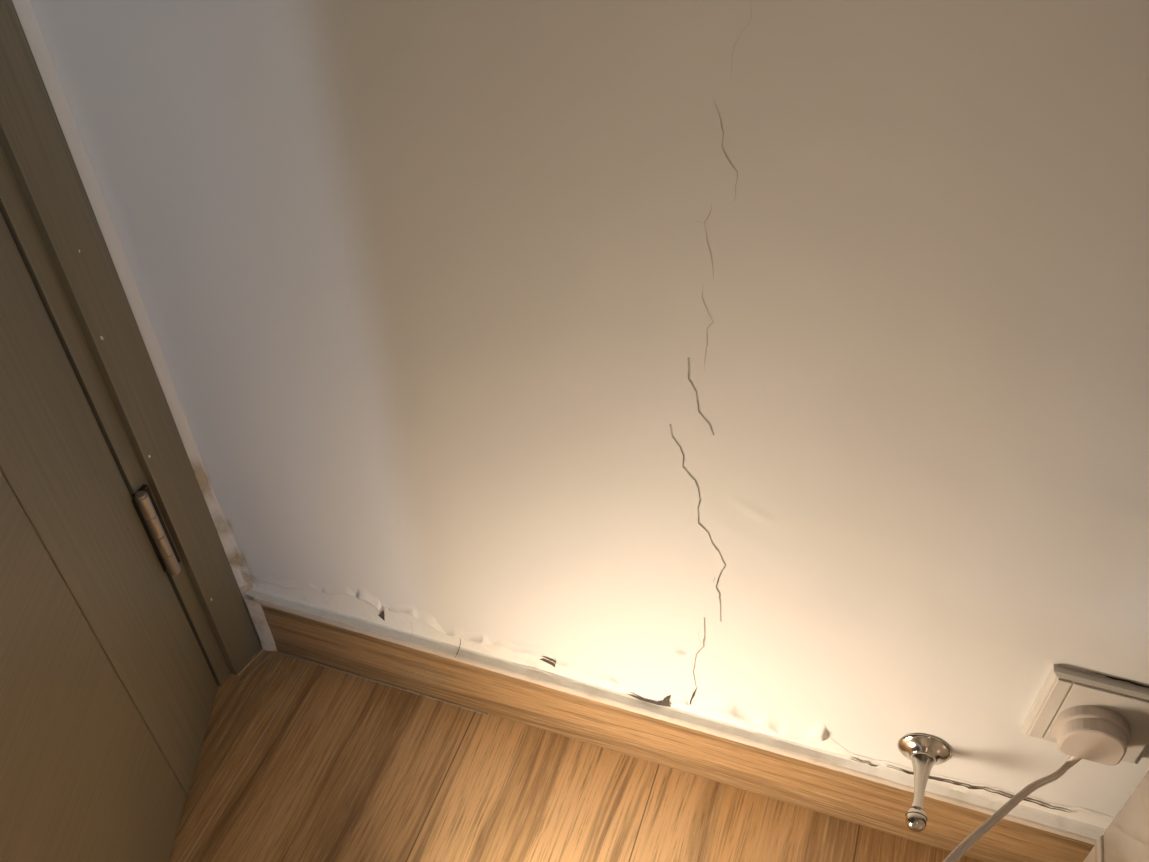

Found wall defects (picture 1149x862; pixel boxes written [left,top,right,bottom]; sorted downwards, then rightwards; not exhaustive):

crack [687,103,738,435]
peeling [263,576,671,707]
crack [669,425,727,706]